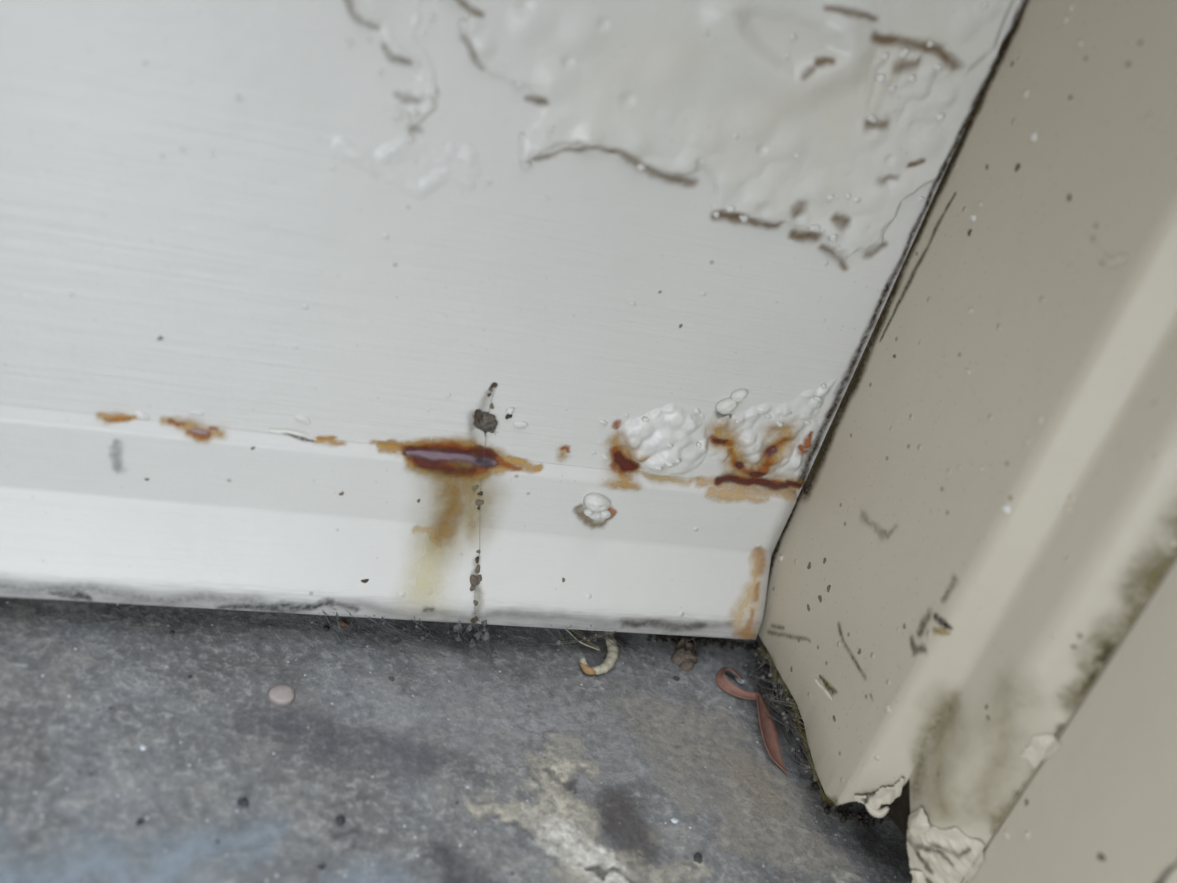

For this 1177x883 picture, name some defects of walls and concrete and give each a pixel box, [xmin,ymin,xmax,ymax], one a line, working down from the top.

corrosion [98,413,137,421]
corrosion [162,419,223,441]
corrosion [313,436,343,445]
corrosion [611,421,645,489]
corrosion [697,426,812,502]
corrosion [372,439,542,593]
leakage [1067,547,1177,707]
peeling [853,777,905,818]
peeling [906,807,985,883]
crack [1157,866,1173,883]